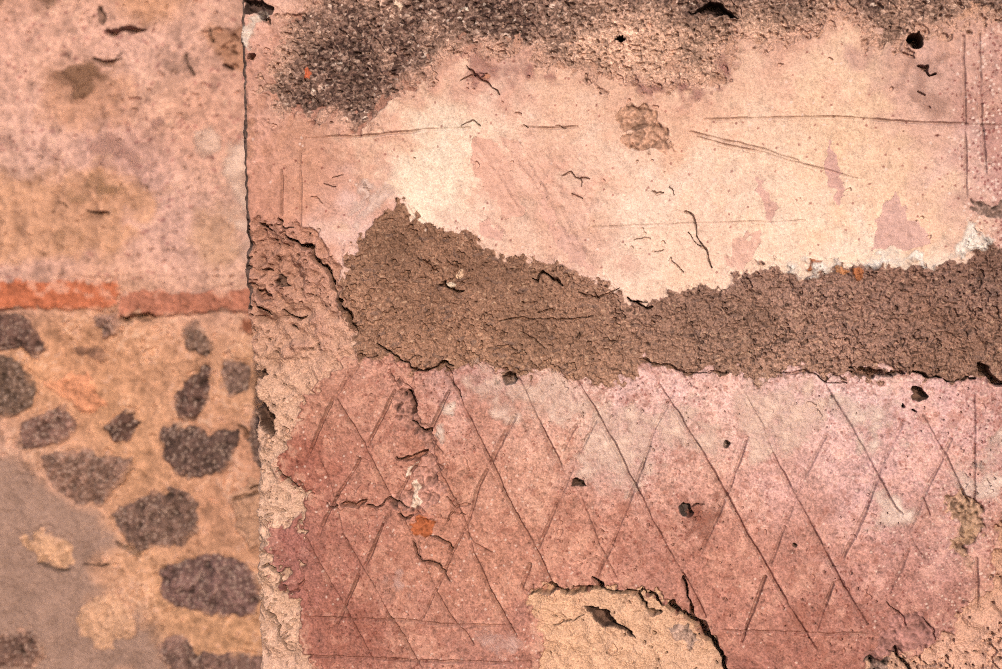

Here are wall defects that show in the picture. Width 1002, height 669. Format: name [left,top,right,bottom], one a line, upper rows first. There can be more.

spalling [256,0,1002,155]
crack [257,218,358,329]
crack [420,259,465,293]
peeling [471,136,594,270]
peeling [872,191,931,251]
spalling [970,199,1002,219]
crack [360,346,461,394]
spalling [192,198,358,669]
flaking render [329,371,471,570]
spalling [526,581,728,669]
crack [532,575,727,668]
spalling [862,487,1002,669]